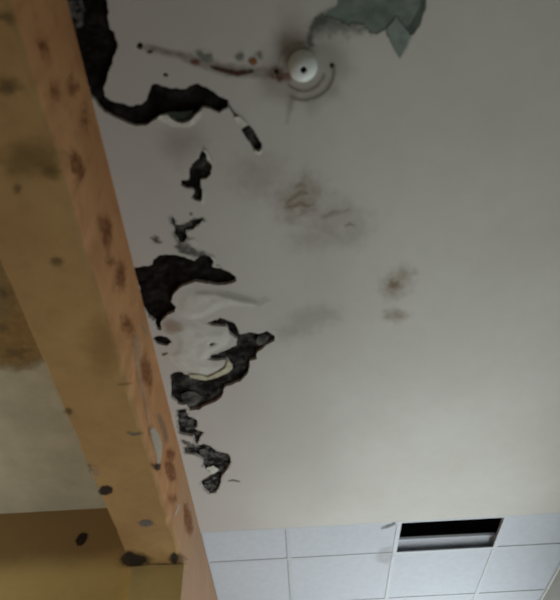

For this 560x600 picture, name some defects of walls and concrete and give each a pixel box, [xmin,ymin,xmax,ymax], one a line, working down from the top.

peeling [315,0,426,59]
flaking render [67,0,229,128]
rust [191,51,262,76]
flaking render [234,116,263,155]
flaking render [181,150,214,204]
flaking render [134,217,236,328]
flaking render [170,317,274,494]